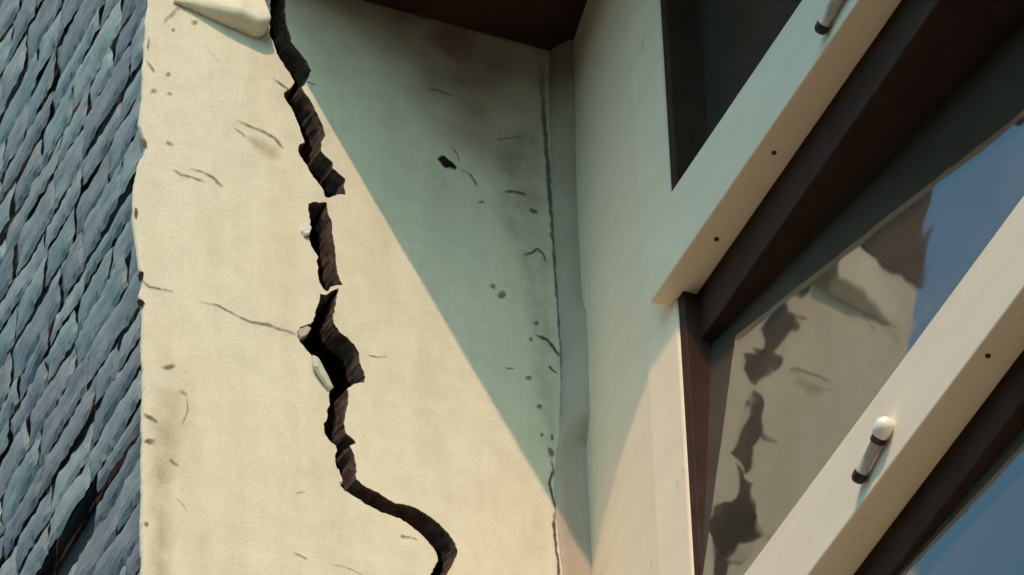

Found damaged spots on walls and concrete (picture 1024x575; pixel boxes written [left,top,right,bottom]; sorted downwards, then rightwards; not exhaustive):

crack [216,0,458,575]
crack [542,107,562,368]
crack [548,468,560,575]